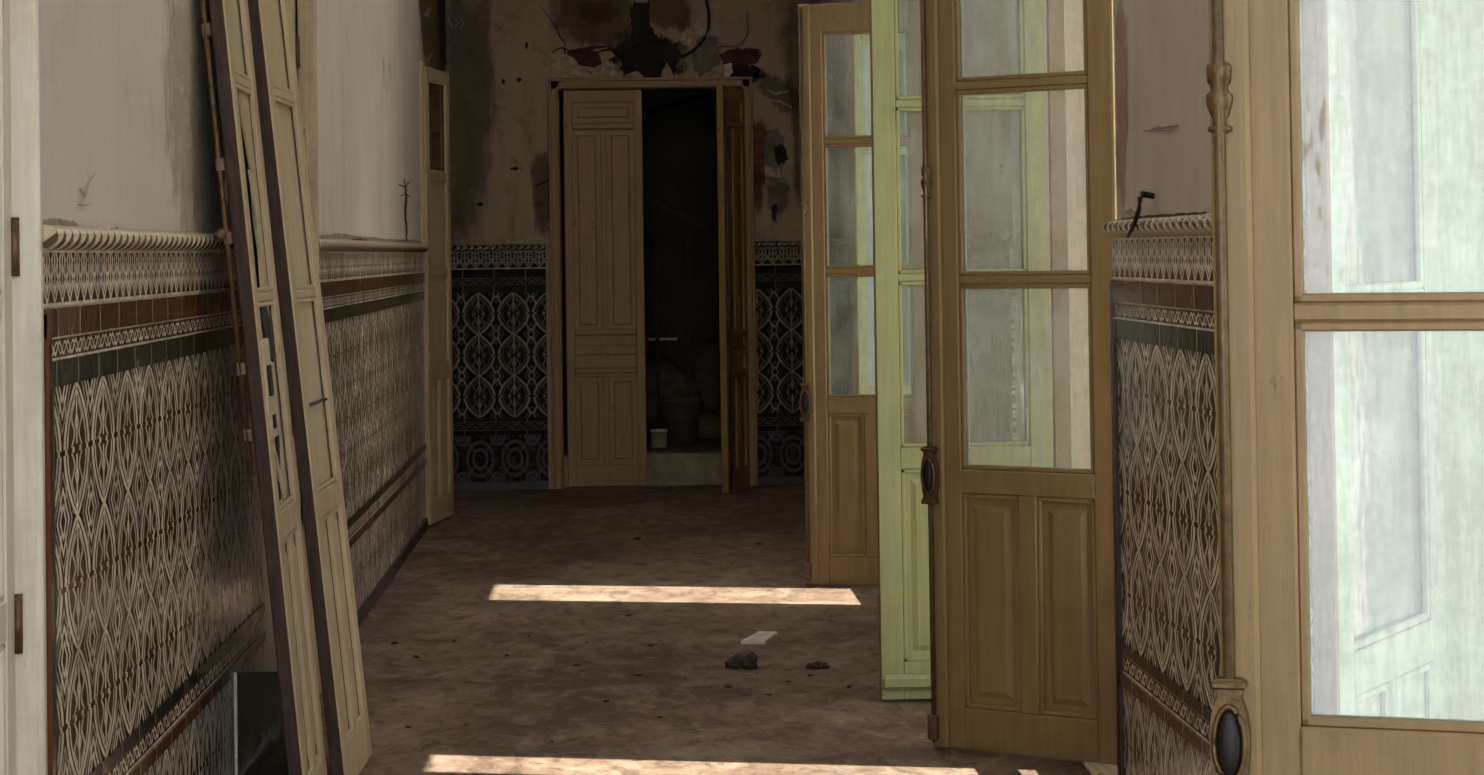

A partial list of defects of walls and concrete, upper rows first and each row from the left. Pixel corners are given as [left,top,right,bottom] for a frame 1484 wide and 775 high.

spalling [552,0,762,83]
leakage [532,154,550,232]
flaking render [763,129,789,222]